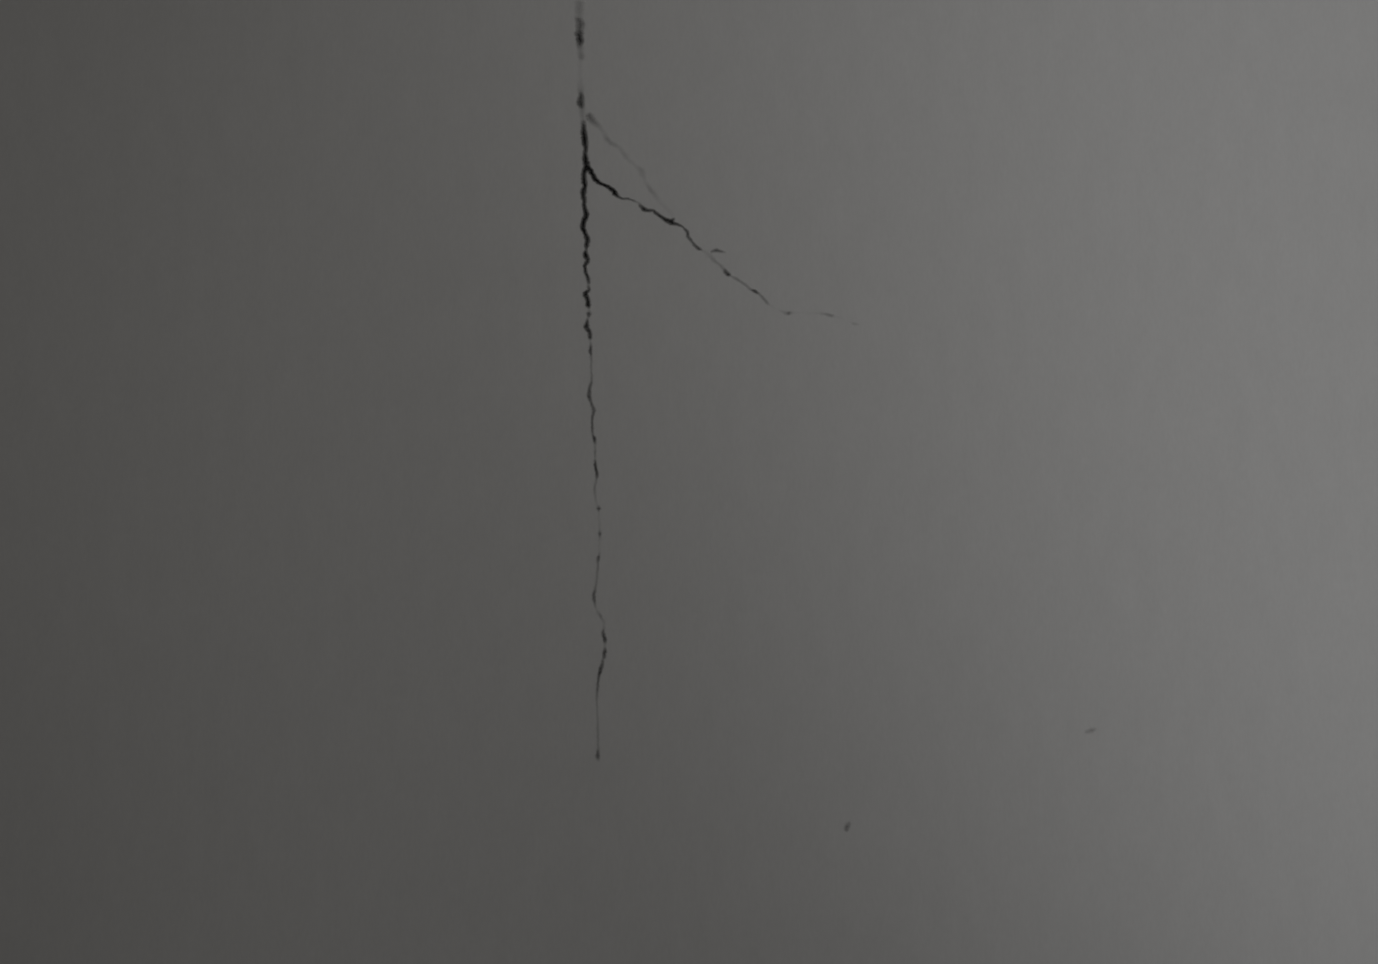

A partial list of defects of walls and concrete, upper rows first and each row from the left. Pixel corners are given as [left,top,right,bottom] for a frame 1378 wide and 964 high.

crack [578,95,700,350]